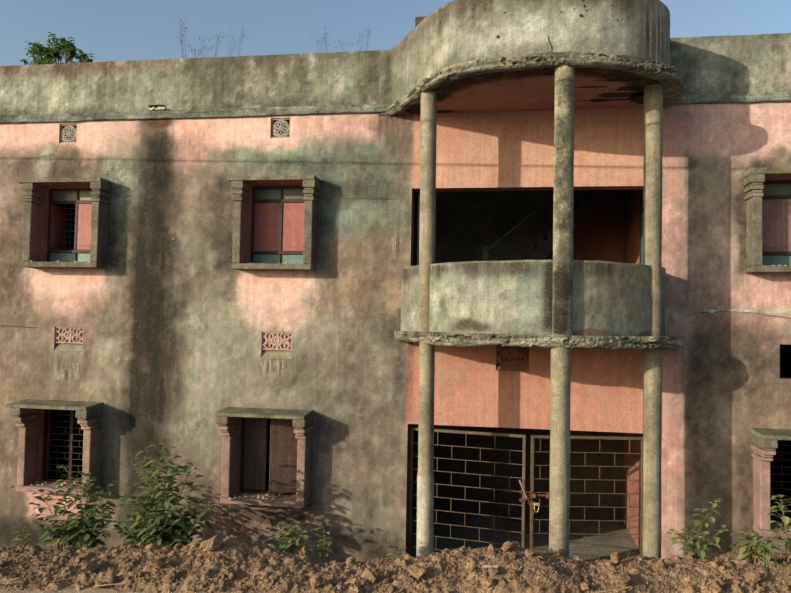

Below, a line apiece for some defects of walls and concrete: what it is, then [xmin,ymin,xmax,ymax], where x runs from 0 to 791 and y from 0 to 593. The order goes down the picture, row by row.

peeling [574,78,647,104]
crack [680,311,791,327]
water stain [36,133,205,536]